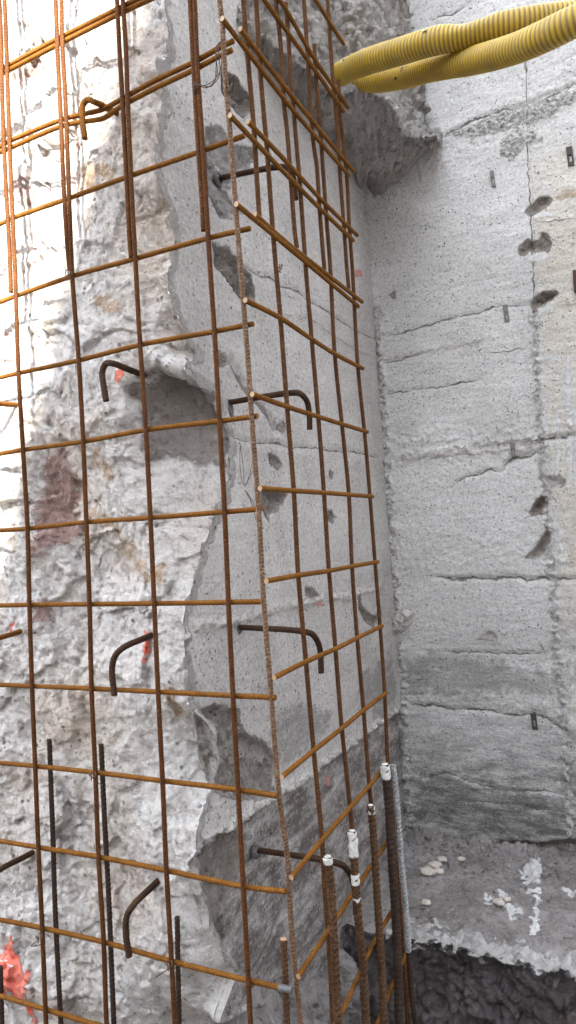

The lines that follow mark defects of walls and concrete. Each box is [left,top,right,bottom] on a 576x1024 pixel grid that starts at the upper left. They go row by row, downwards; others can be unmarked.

crack [248,62,576,363]
spalling [524,197,554,219]
spalling [518,232,552,263]
spalling [530,290,559,316]
crack [451,435,575,488]
spalling [0,0,394,1024]
damp [386,858,576,978]